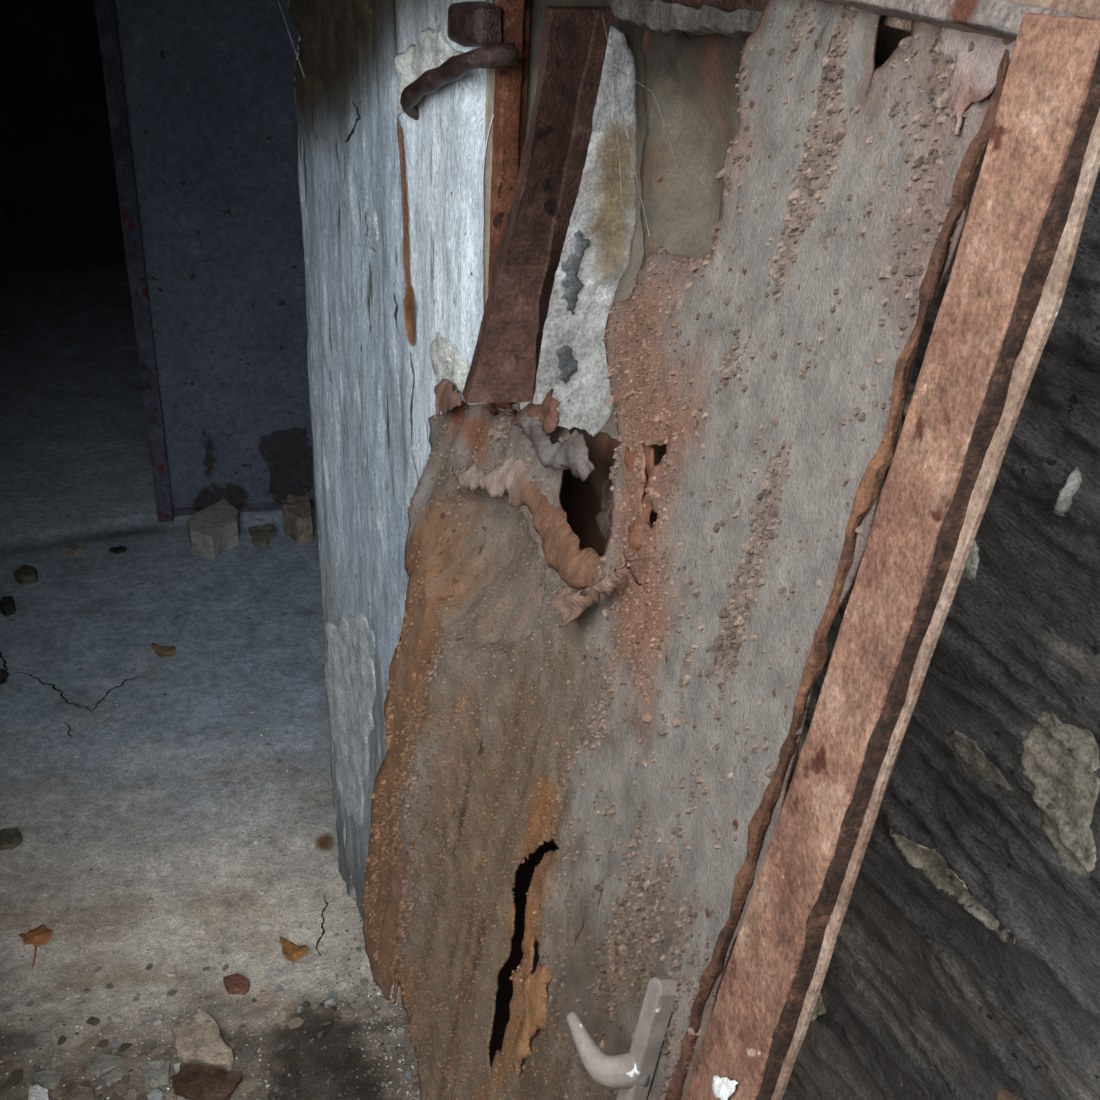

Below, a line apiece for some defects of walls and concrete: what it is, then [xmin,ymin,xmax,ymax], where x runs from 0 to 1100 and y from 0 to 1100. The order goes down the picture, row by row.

peeling [495,25,637,542]
peeling [624,444,655,552]
corrosion [362,2,983,1100]
crack [0,652,147,738]
flaking render [1020,711,1100,879]
flaking render [889,828,1016,945]
flaking render [811,994,826,1022]